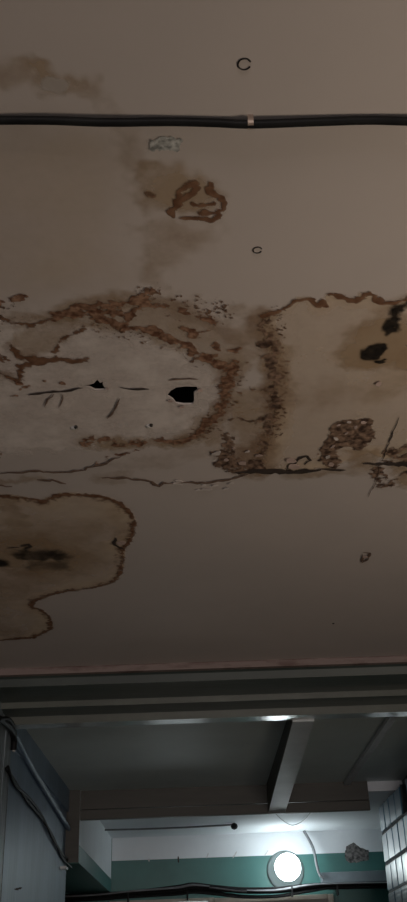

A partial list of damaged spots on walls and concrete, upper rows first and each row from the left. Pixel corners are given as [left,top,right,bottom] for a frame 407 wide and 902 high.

water stain [260,292,407,372]
peeling [0,282,290,476]
peeling [318,418,376,469]
peeling [369,444,407,488]
water stain [0,493,137,641]
spalling [345,843,369,863]